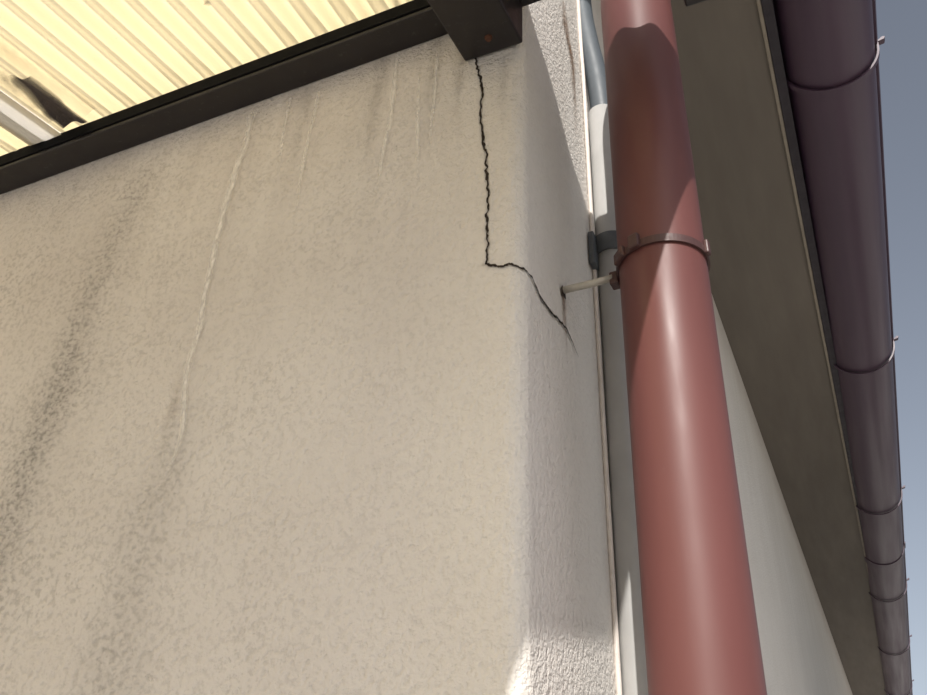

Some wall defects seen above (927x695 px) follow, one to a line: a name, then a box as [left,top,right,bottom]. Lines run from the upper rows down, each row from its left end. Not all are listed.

crack [474,58,577,353]